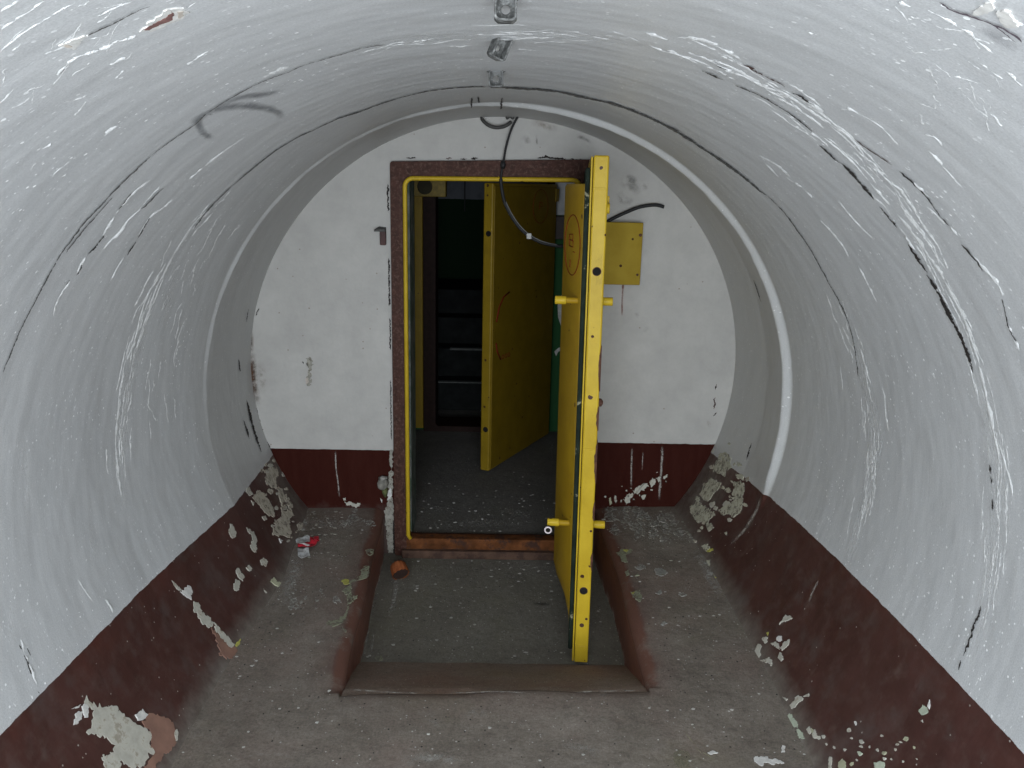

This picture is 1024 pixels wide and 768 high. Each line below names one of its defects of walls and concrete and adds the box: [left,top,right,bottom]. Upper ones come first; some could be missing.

spalling [139,7,190,32]
crack [941,3,1022,42]
crack [3,45,381,372]
crack [705,66,973,372]
peeling [246,459,307,543]
peeling [604,442,750,578]
peeling [172,581,241,659]
peeling [755,615,792,666]
crack [958,606,981,670]
peeling [72,695,178,768]
peeling [754,745,785,766]
peeling [783,693,918,768]